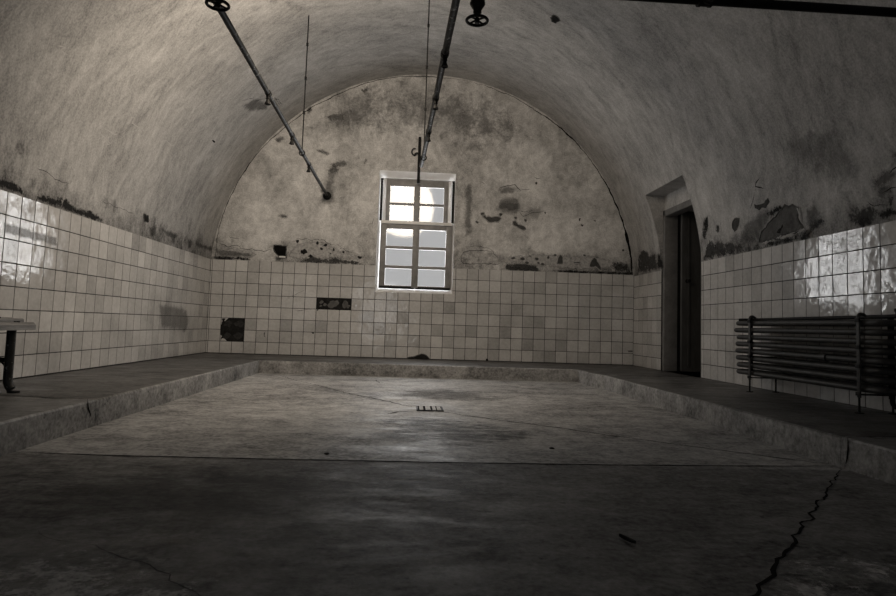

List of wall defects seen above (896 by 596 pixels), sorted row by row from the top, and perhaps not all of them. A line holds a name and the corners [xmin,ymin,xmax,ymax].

spalling [759,204,804,244]
peeling [221,237,362,260]
peeling [461,246,616,270]
peeling [316,297,352,311]
peeling [220,318,245,342]
crack [438,394,849,596]